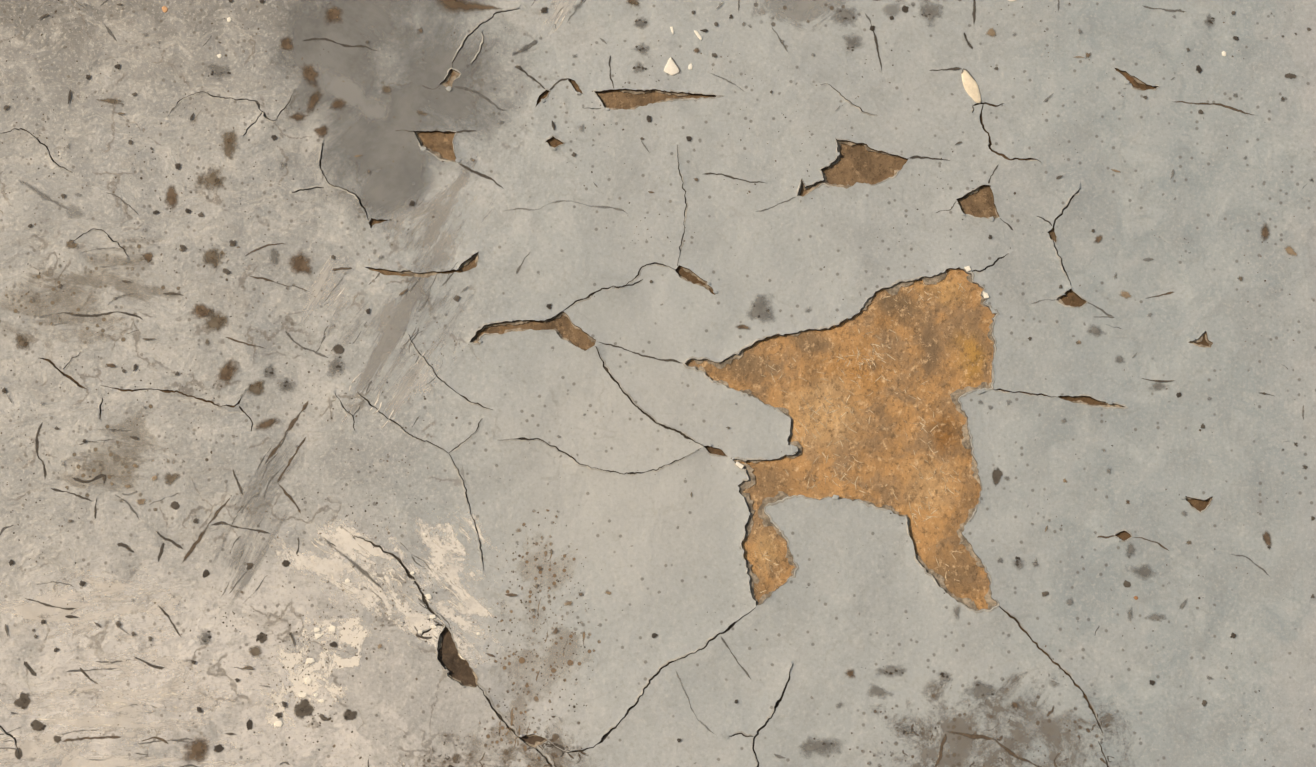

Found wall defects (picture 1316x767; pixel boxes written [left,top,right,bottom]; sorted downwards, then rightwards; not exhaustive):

peeling [568,30,724,122]
damp [283,0,481,428]
crack [563,144,795,311]
peeling [797,138,908,197]
peeling [956,185,1000,239]
crack [971,102,1041,183]
peeling [469,304,596,351]
crack [335,335,703,571]
peeling [683,266,1010,613]
crack [355,536,444,639]
spalling [435,624,479,688]
crack [476,608,793,767]